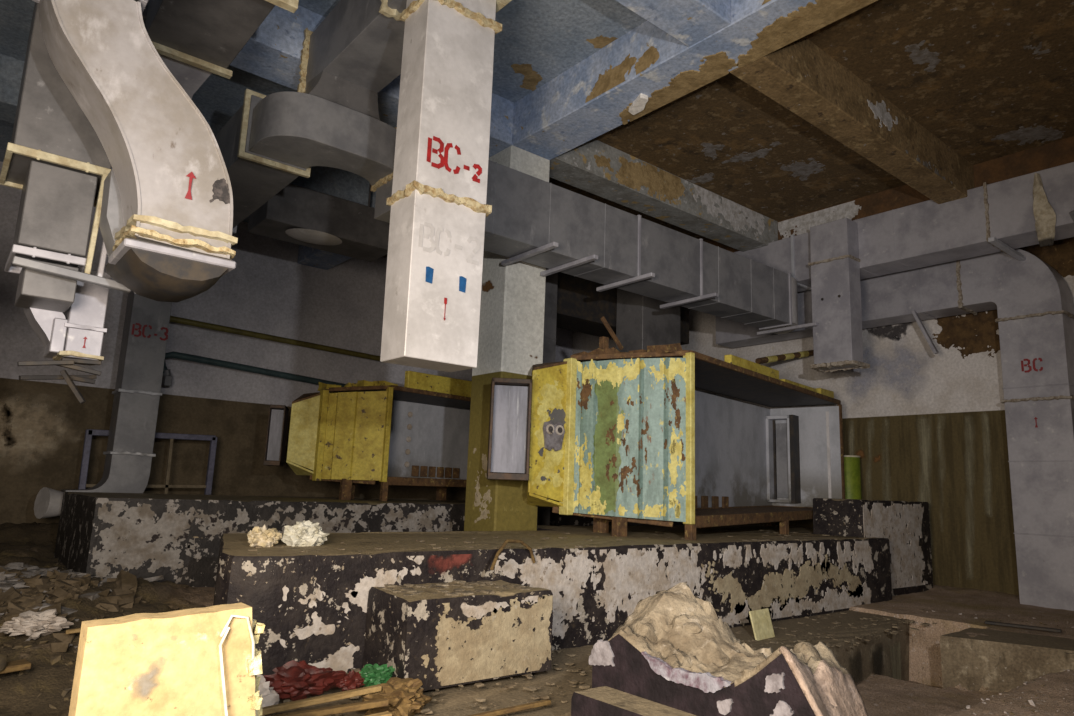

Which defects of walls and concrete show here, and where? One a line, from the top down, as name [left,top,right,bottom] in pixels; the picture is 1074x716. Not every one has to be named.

flaking render [511,64,542,91]
flaking render [586,35,618,48]
flaking render [585,46,659,103]
spalling [619,0,878,125]
flaking render [1018,237,1074,277]
flaking render [932,309,1000,359]
peeling [278,555,424,648]
peeling [420,503,928,689]
peeling [308,644,360,673]
peeling [641,651,734,715]
peeling [764,672,794,716]